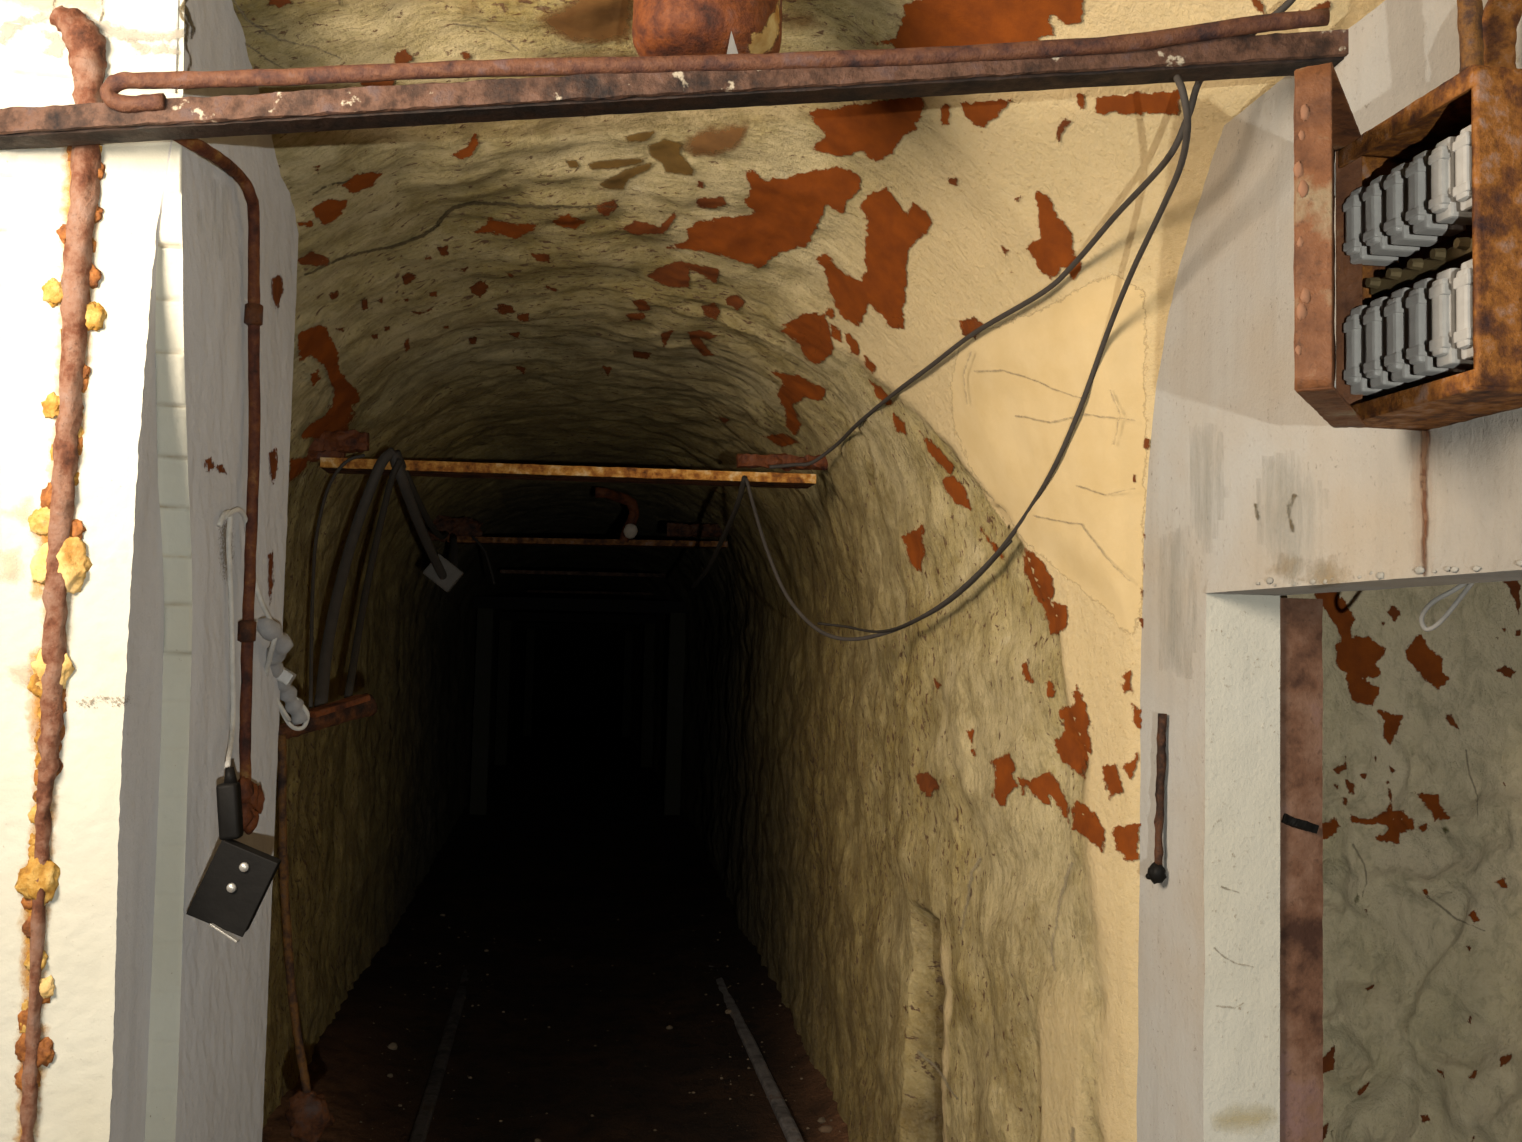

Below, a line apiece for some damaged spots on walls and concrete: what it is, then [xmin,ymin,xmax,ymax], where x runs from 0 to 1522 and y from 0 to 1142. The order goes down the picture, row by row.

peeling [871,0,1084,48]
corrosion [64,146,72,219]
peeling [473,199,618,239]
peeling [425,245,529,338]
peeling [623,97,1011,511]
corrosion [74,376,89,486]
peeling [289,325,360,484]
peeling [1502,581,1521,636]
corrosion [31,696,54,819]
peeling [966,662,1142,862]
peeling [1314,592,1450,844]
peeling [1496,665,1516,678]